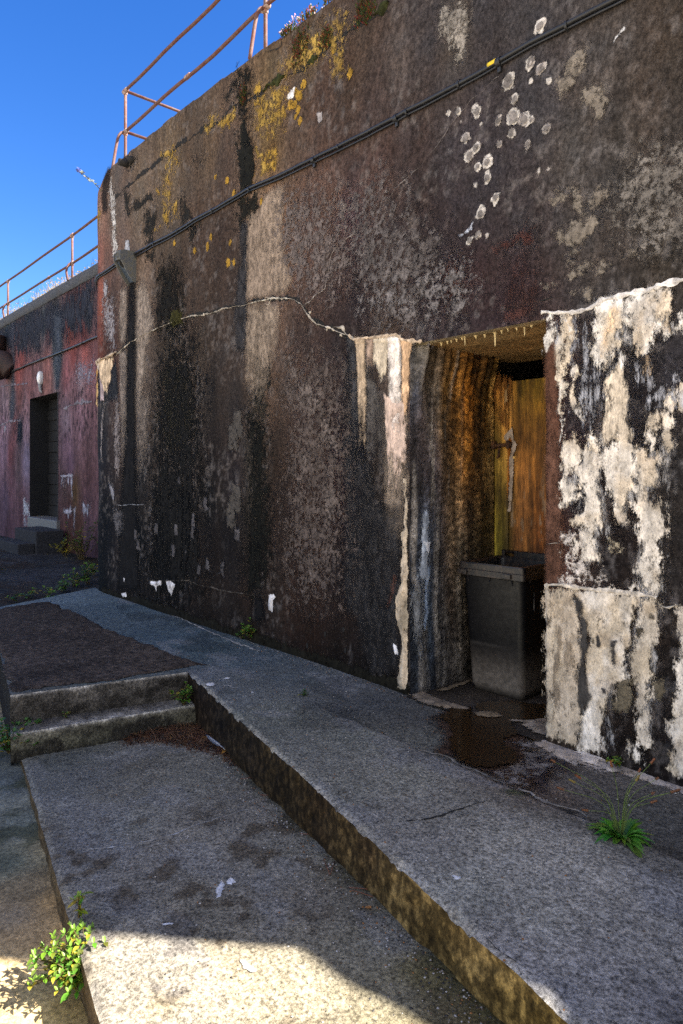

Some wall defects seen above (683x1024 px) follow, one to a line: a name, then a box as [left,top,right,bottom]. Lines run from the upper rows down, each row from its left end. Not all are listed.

water stain [95,186,260,651]
water stain [224,62,291,621]
crack [116,76,499,354]
water stain [344,278,683,794]
crack [405,749,588,821]